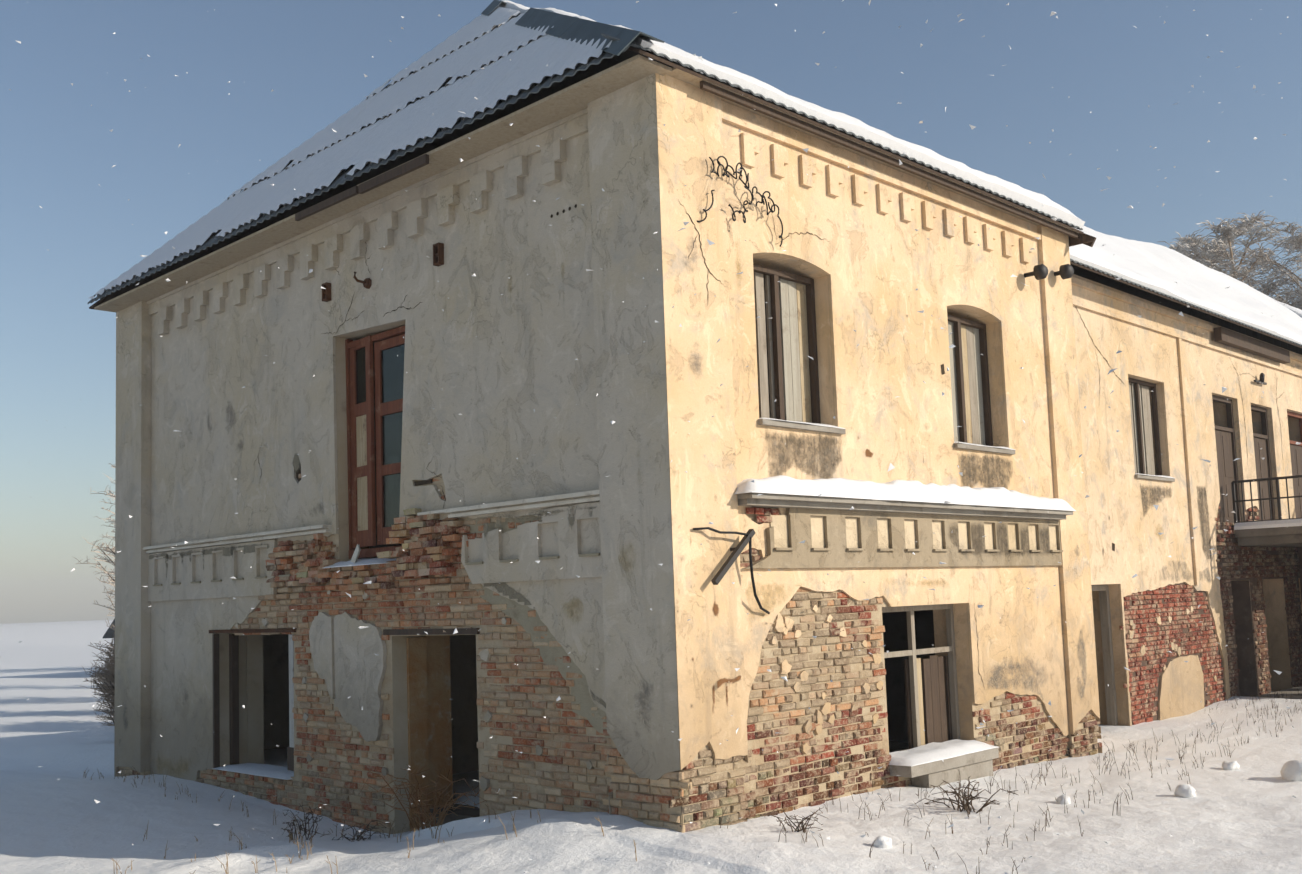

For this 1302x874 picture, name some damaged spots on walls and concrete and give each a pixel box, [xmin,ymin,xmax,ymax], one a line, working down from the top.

crack [324,242,422,334]
leakage [769,434,839,479]
leakage [960,455,1010,488]
spalling [196,478,912,834]
spalling [1119,506,1302,725]
spalling [972,693,1102,772]